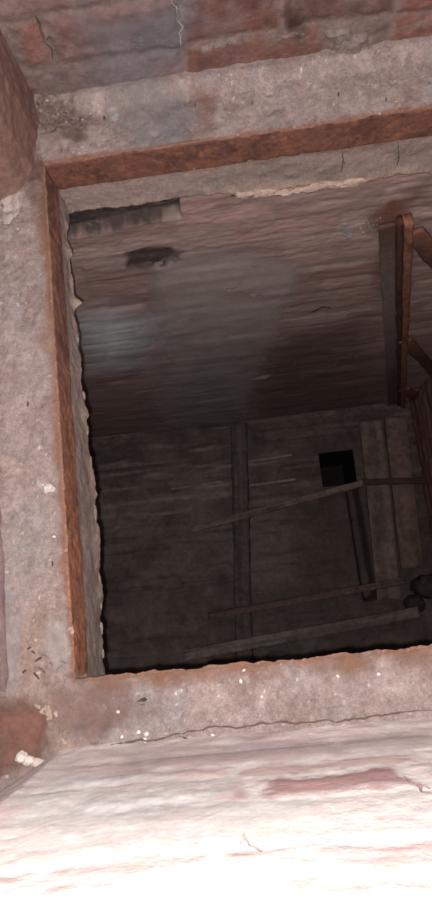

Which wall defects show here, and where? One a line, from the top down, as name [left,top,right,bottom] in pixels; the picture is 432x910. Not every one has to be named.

crack [35,16,54,61]
spalling [231,177,371,199]
crack [111,710,431,745]